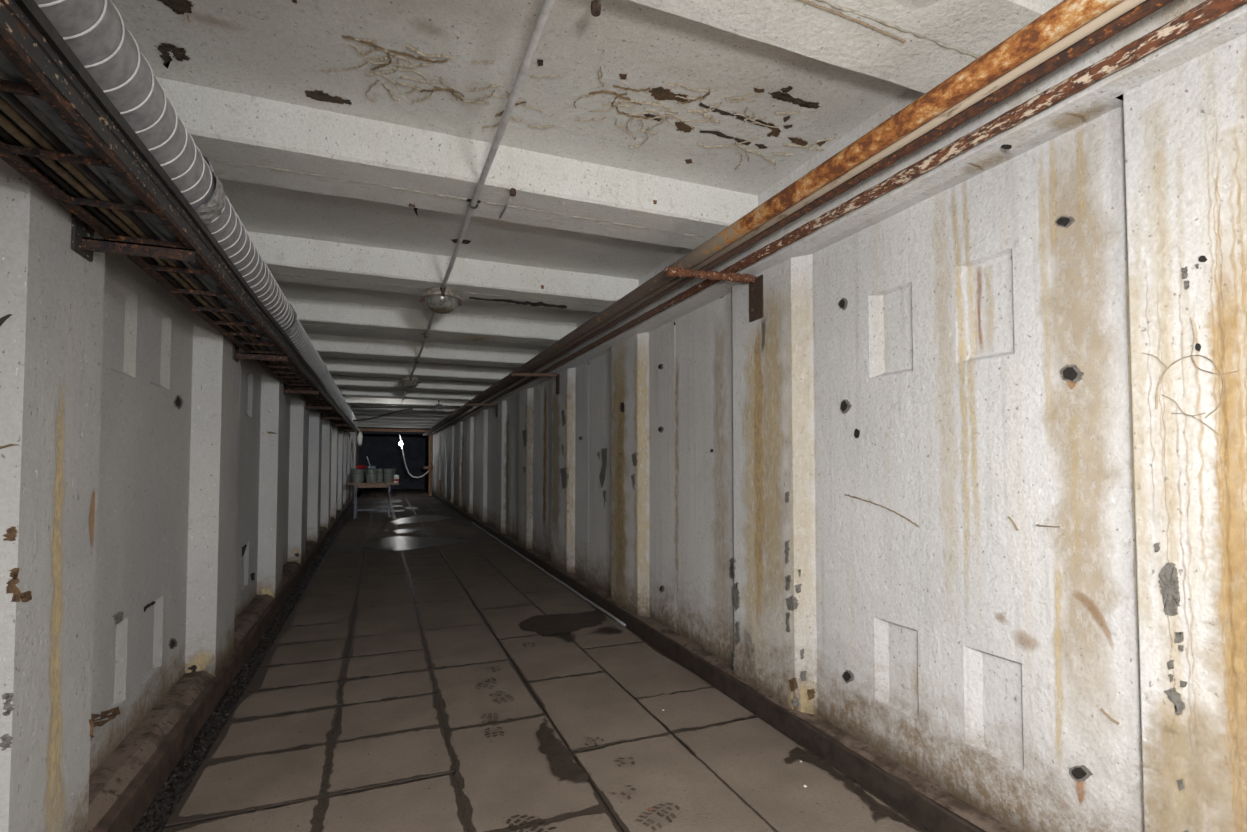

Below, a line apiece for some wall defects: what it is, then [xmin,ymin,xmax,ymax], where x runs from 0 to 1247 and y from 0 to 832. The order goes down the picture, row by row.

peeling [157,0,193,22]
peeling [157,43,190,69]
crack [321,35,836,170]
peeling [3,526,18,541]
peeling [6,568,32,602]
peeling [1153,542,1180,616]
peeling [1164,632,1187,715]
peeling [2,693,14,716]
peeling [0,734,13,751]